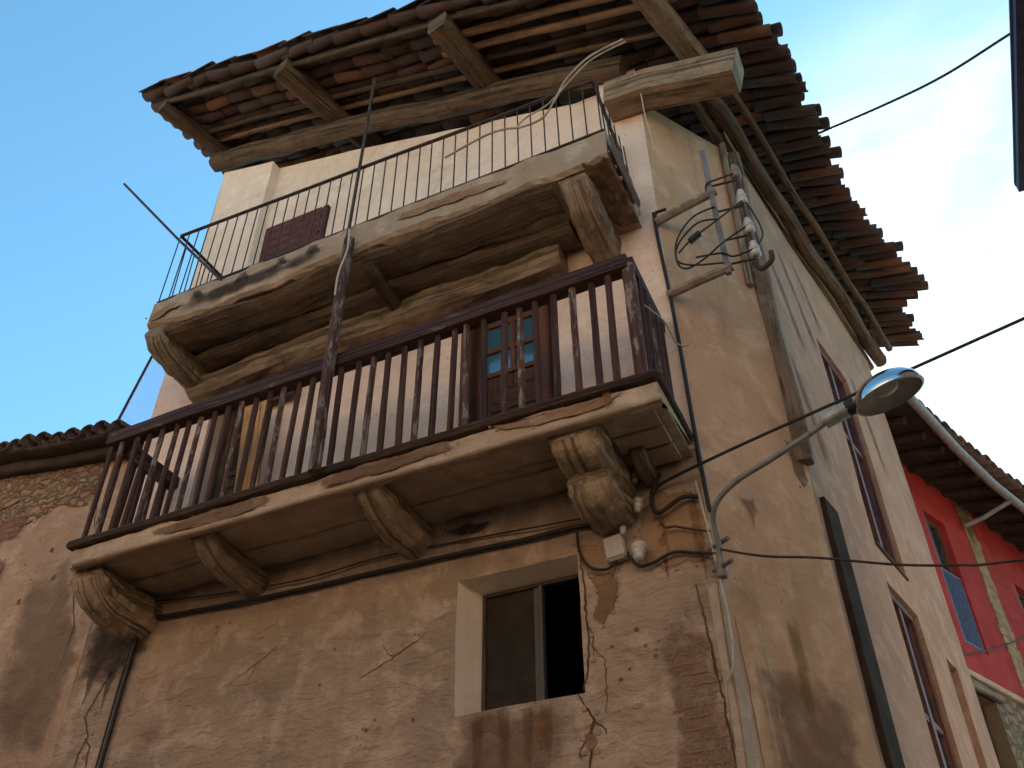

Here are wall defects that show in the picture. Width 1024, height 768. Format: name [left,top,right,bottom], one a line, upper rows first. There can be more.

spalling [572,544,621,628]
damp [84,626,145,703]
crack [362,631,429,677]
crack [578,552,608,768]
flaking render [644,582,765,768]